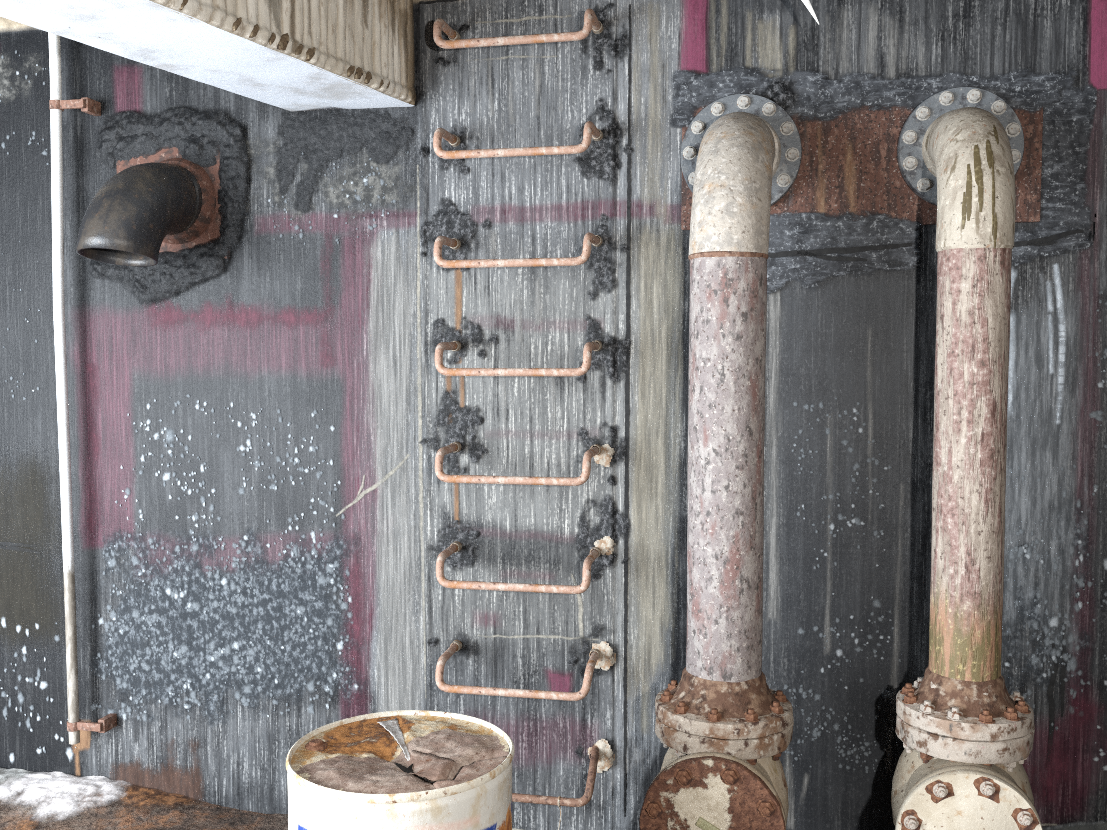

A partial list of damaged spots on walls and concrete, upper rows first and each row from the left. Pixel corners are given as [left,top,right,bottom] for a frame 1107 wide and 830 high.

water stain [271,0,298,55]
water stain [0,474,76,760]
water stain [90,395,359,724]
water stain [1002,490,1107,716]
water stain [0,754,120,816]